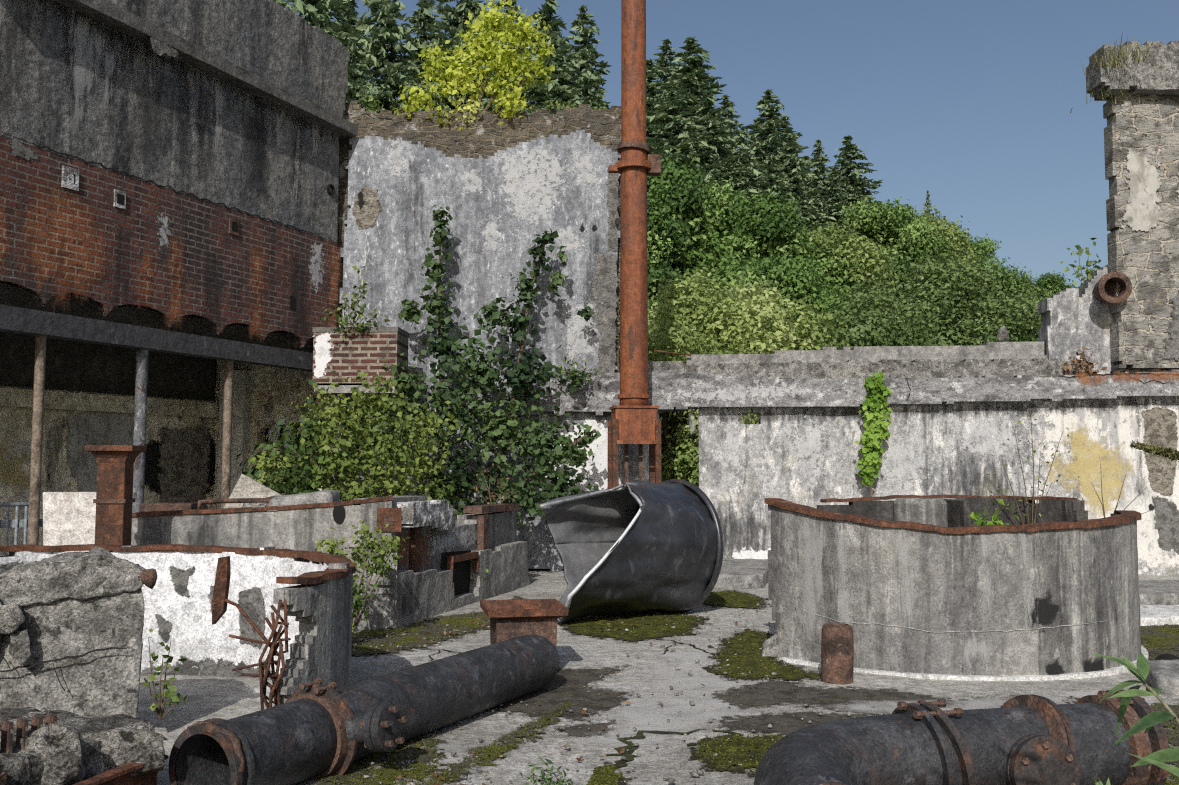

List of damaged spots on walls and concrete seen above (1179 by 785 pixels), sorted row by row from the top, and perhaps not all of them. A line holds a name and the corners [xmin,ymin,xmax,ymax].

damp [65,10,224,159]
peeling [1121,147,1179,232]
rust [22,185,105,298]
rust [167,240,183,320]
damp [658,383,809,444]
rust [1079,373,1179,384]
damp [1049,399,1148,514]
peeling [0,558,47,573]
peeling [155,614,172,643]
peeling [169,566,195,598]
spalling [238,587,265,648]
damp [1019,534,1059,632]